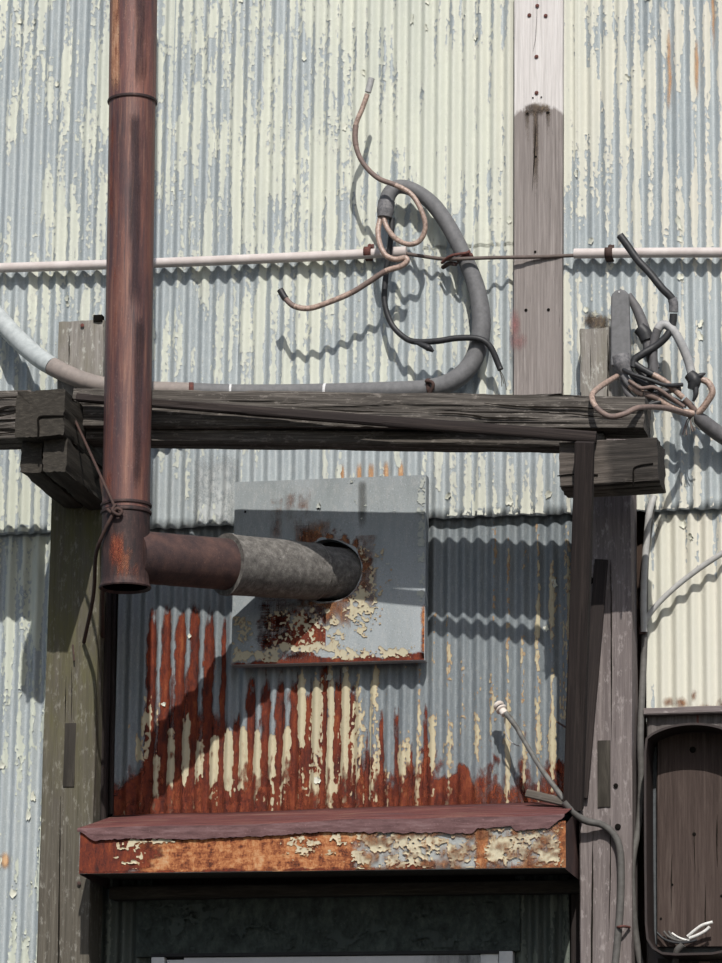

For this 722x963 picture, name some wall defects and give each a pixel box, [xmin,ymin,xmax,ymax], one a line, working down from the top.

peeling [0,0,110,351]
peeling [152,0,514,395]
peeling [0,339,57,390]
peeling [563,0,722,708]
peeling [0,450,52,911]
corrosion [112,524,564,816]
peeling [128,448,571,811]
peeling [0,856,38,963]
peeling [110,838,175,886]
corrosion [79,821,566,874]
peeling [280,827,568,880]
peeling [517,894,570,963]